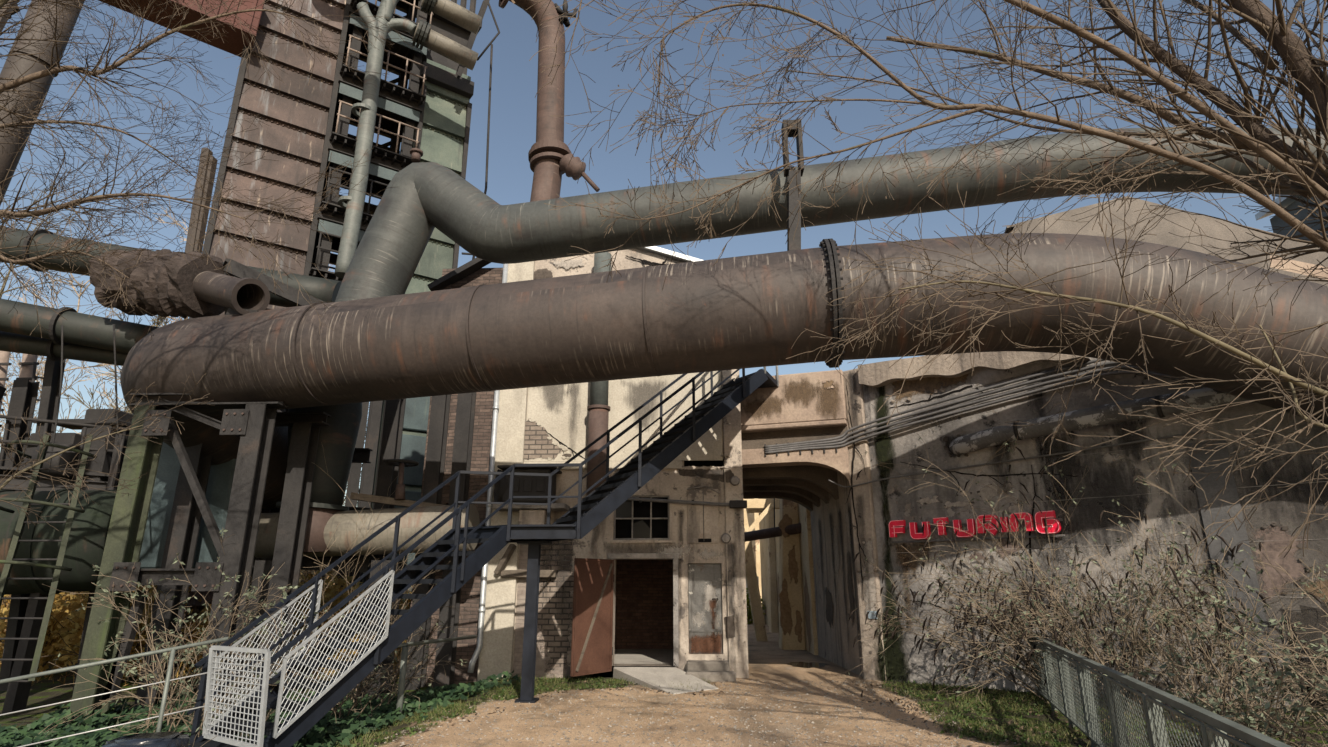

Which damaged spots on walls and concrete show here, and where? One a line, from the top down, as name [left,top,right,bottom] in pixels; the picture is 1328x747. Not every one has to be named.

leakage [544,385,578,424]
leakage [632,383,660,426]
peeling [523,419,571,460]
leakage [1038,435,1080,501]
leakage [742,372,910,683]
leakage [1067,419,1164,587]
peeling [538,539,574,673]